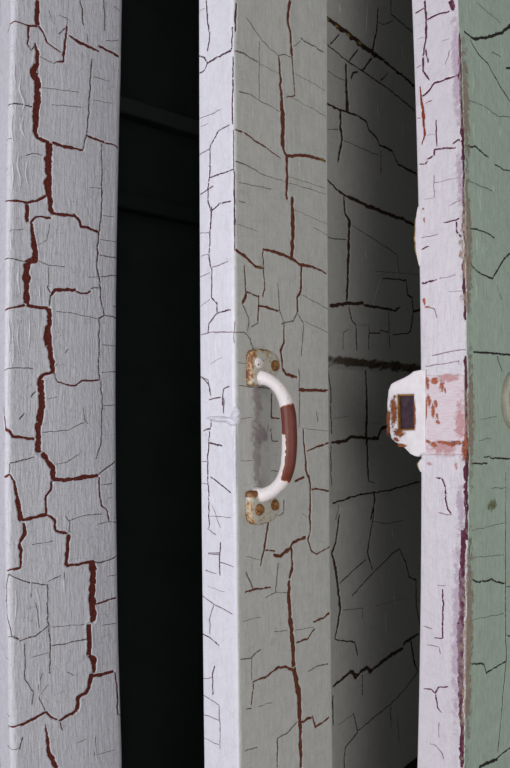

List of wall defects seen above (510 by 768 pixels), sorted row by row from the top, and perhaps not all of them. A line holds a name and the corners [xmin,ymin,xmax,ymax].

crack [4,0,120,768]
crack [199,0,510,768]
rust [386,395,406,447]